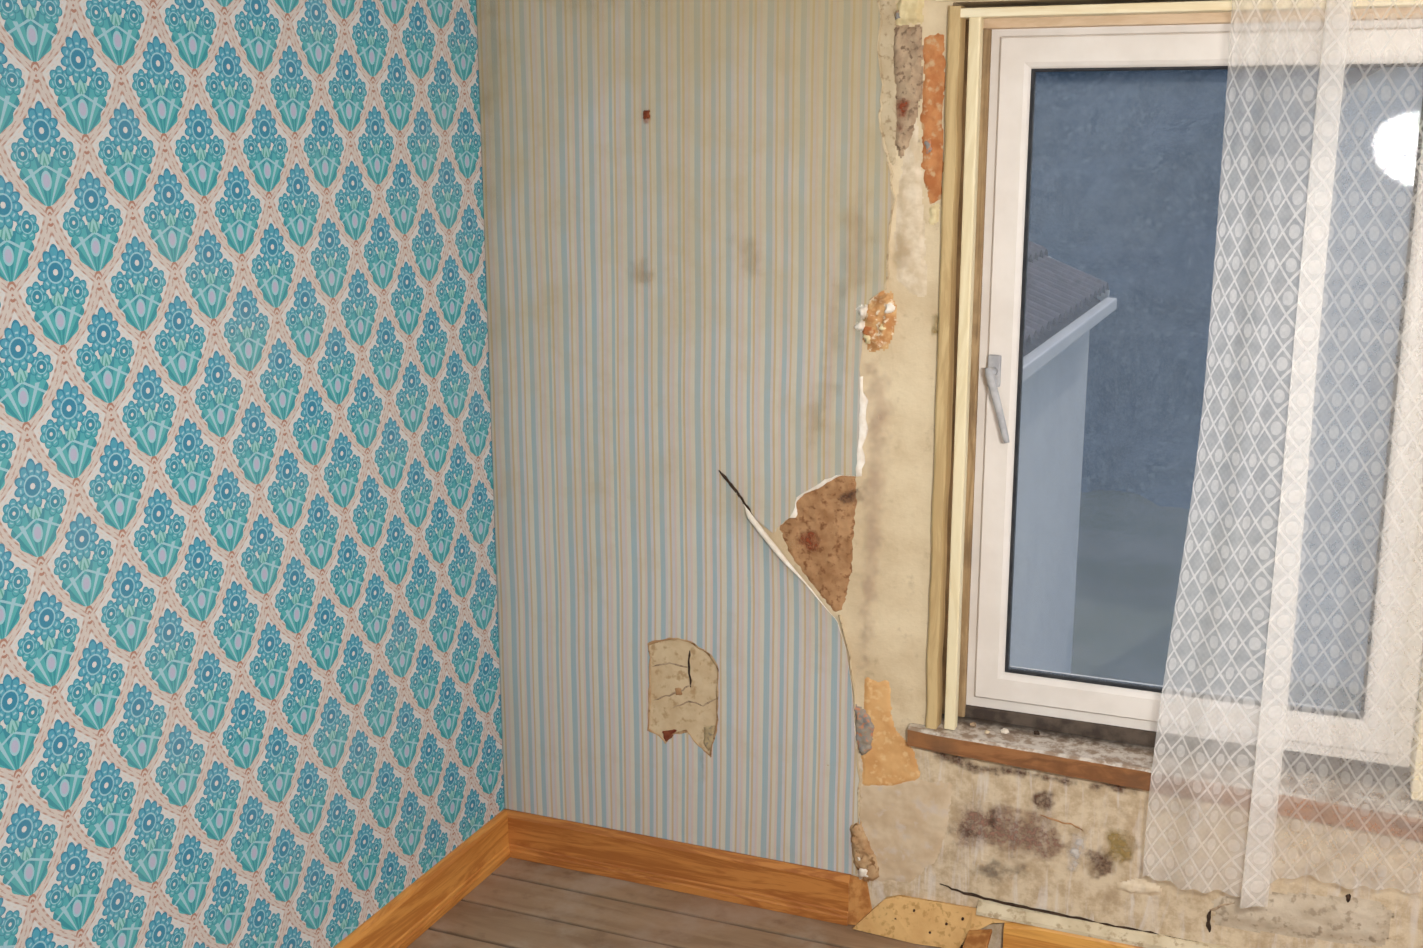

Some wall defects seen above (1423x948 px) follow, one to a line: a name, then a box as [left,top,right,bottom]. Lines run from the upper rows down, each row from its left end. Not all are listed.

flaking render [854,0,946,352]
flaking render [780,476,857,612]
spalling [647,638,719,757]
flaking render [850,677,953,883]
leakage [940,753,1069,857]
leakage [1091,833,1132,875]